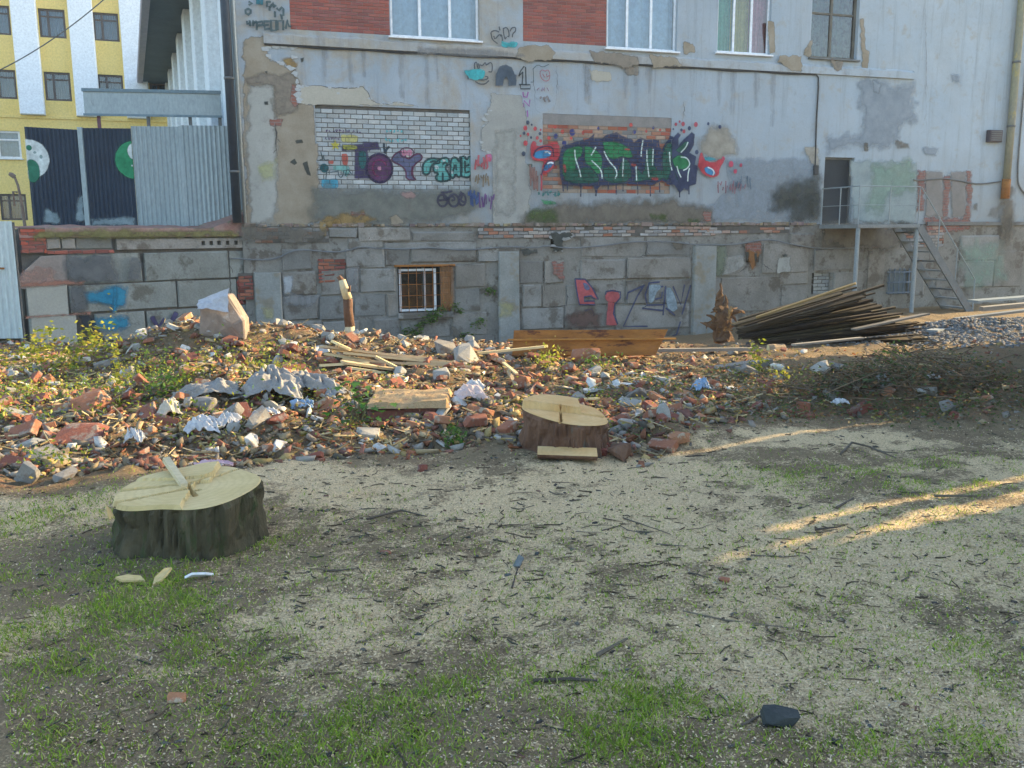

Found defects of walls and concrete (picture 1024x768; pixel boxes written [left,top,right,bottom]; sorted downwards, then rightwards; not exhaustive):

flaking render [649,41,695,68]
flaking render [768,21,813,72]
flaking render [860,19,870,68]
flaking render [242,36,414,227]
spalling [898,170,977,235]